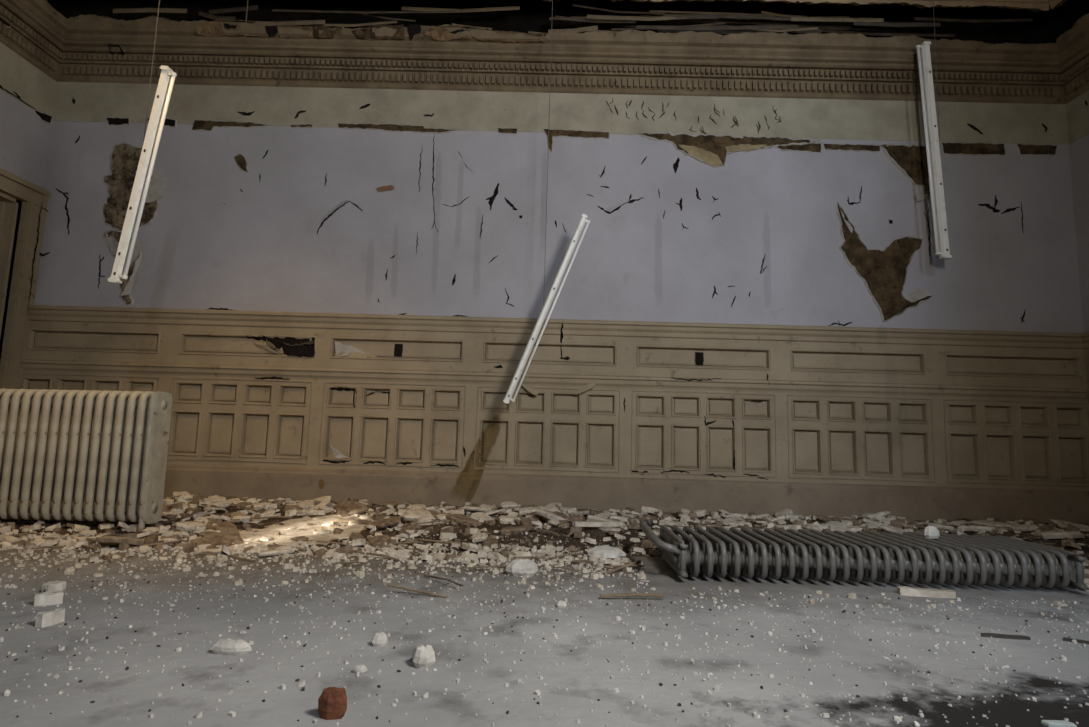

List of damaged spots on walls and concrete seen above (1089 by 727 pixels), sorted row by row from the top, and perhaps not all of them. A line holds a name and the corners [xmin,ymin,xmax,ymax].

peeling [193,20,545,43]
crack [0,85,36,110]
peeling [102,142,143,258]
crack [317,173,362,234]
peeling [639,132,823,168]
peeling [878,143,931,205]
peeling [119,168,168,307]
peeling [836,202,933,322]